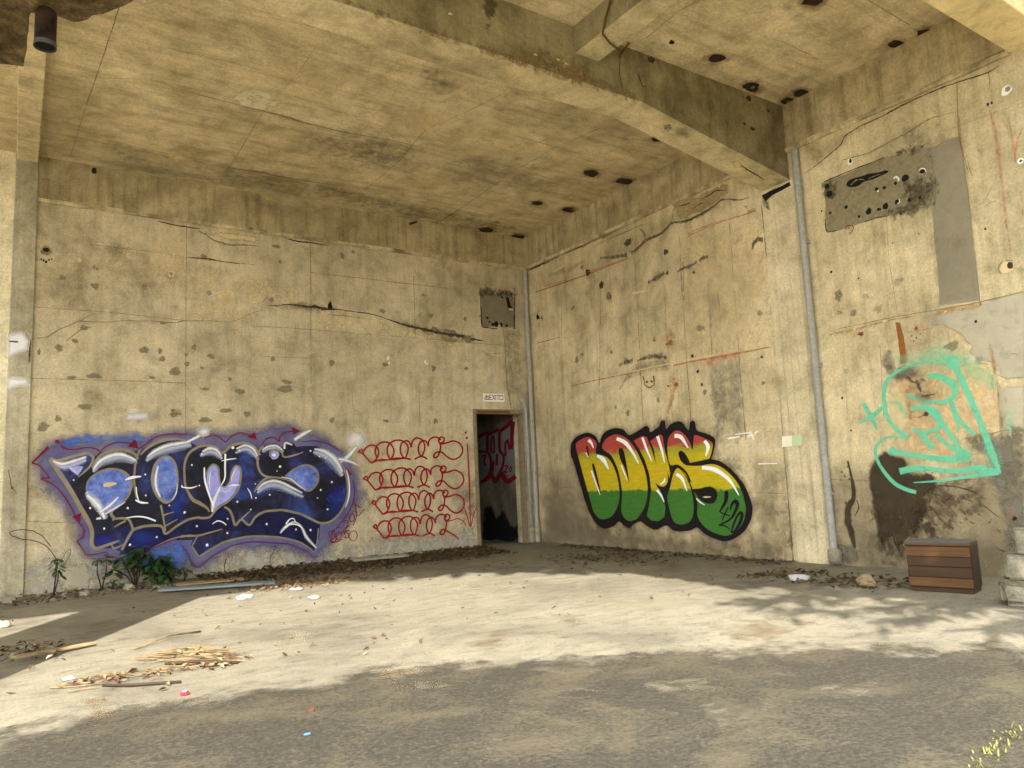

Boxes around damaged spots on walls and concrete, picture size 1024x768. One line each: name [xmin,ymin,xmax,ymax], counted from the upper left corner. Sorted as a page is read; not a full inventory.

crack [600,65,1000,259]
crack [22,295,511,408]
corrosion [838,291,1024,364]
peeling [908,366,1002,454]
leakage [831,428,1024,576]